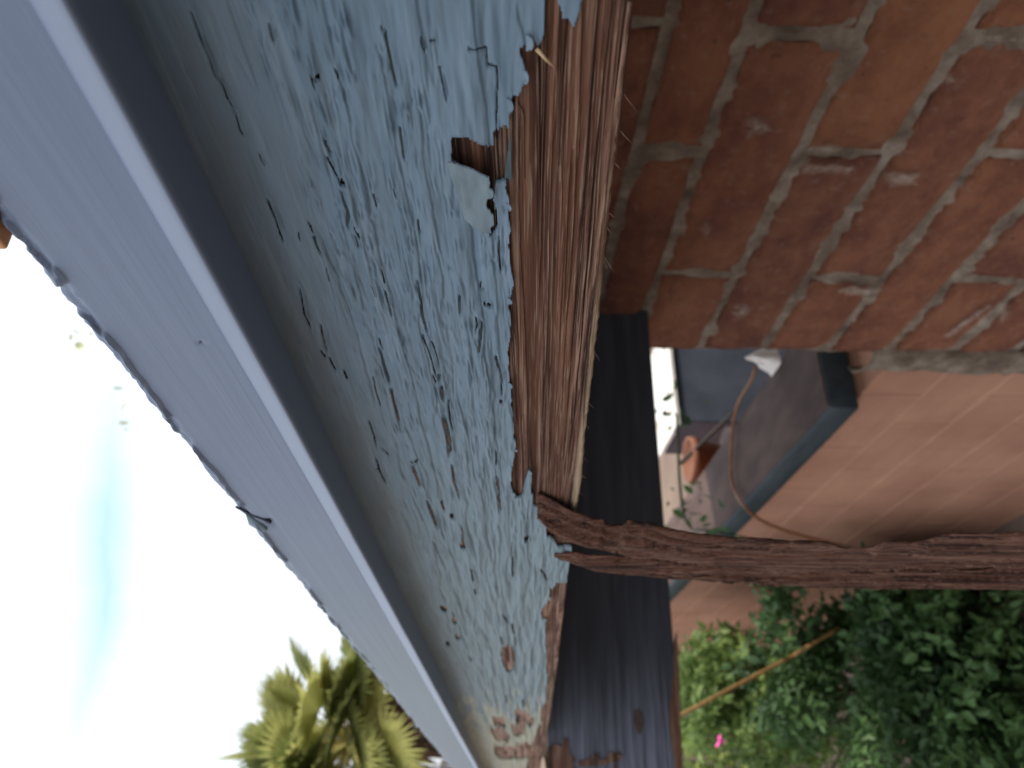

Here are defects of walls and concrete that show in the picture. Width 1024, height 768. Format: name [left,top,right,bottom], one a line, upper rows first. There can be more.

crack [191,12,244,134]
crack [381,26,449,101]
crack [468,46,498,143]
crack [268,201,331,281]
crack [324,142,400,247]
peeling [447,0,635,512]
crack [458,237,507,395]
crack [370,269,467,542]
crack [235,506,272,532]
crack [494,451,502,510]
crack [511,556,554,581]
peeling [491,575,622,768]